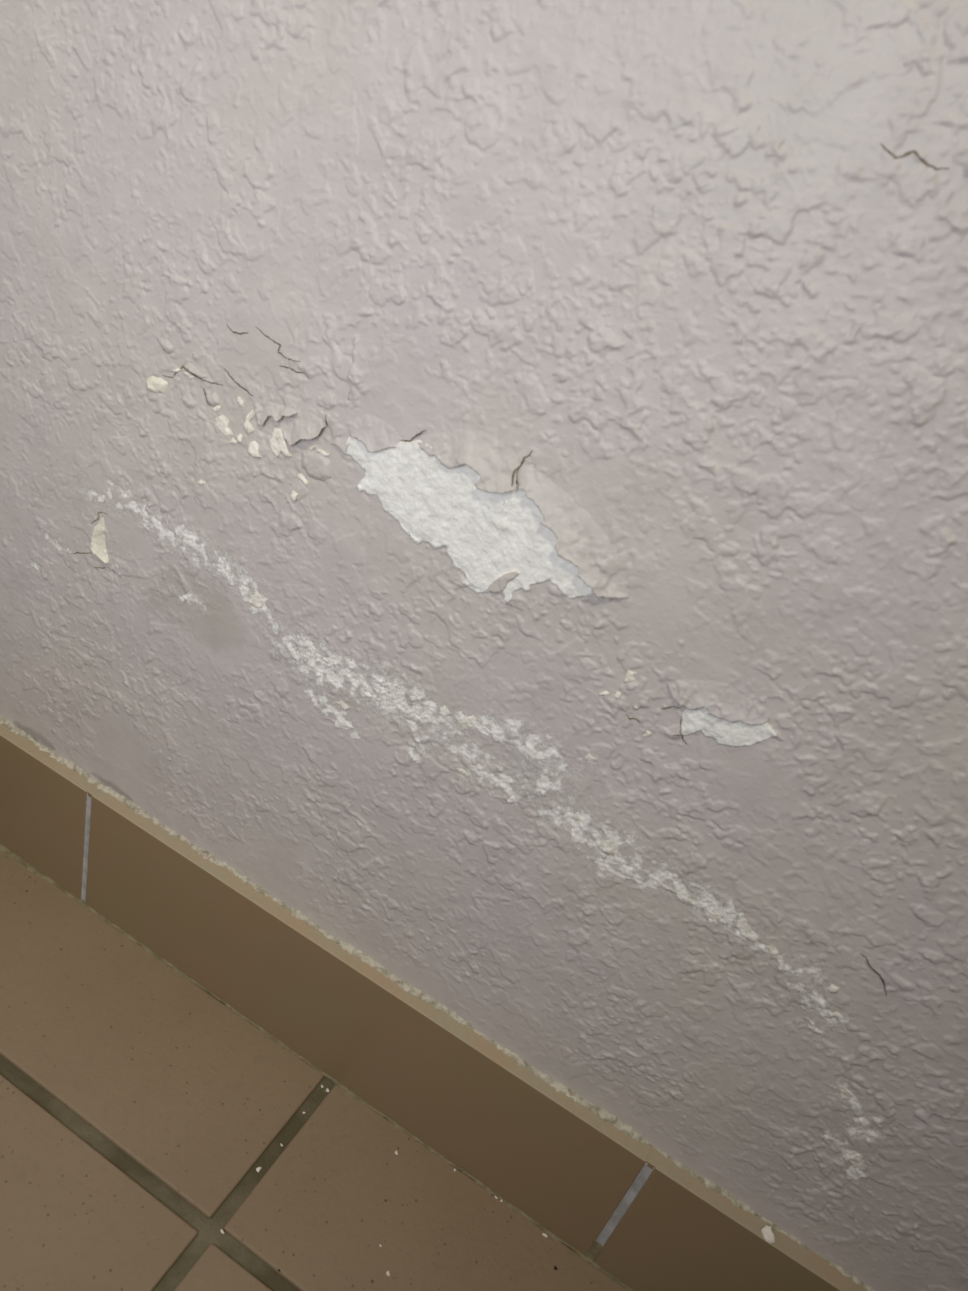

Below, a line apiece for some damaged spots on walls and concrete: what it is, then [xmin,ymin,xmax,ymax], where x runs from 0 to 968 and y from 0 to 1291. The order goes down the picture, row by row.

peeling [146,337,630,604]
leakage [82,480,850,1060]
peeling [599,670,636,699]
peeling [661,677,776,747]
spalling [0,717,875,1291]